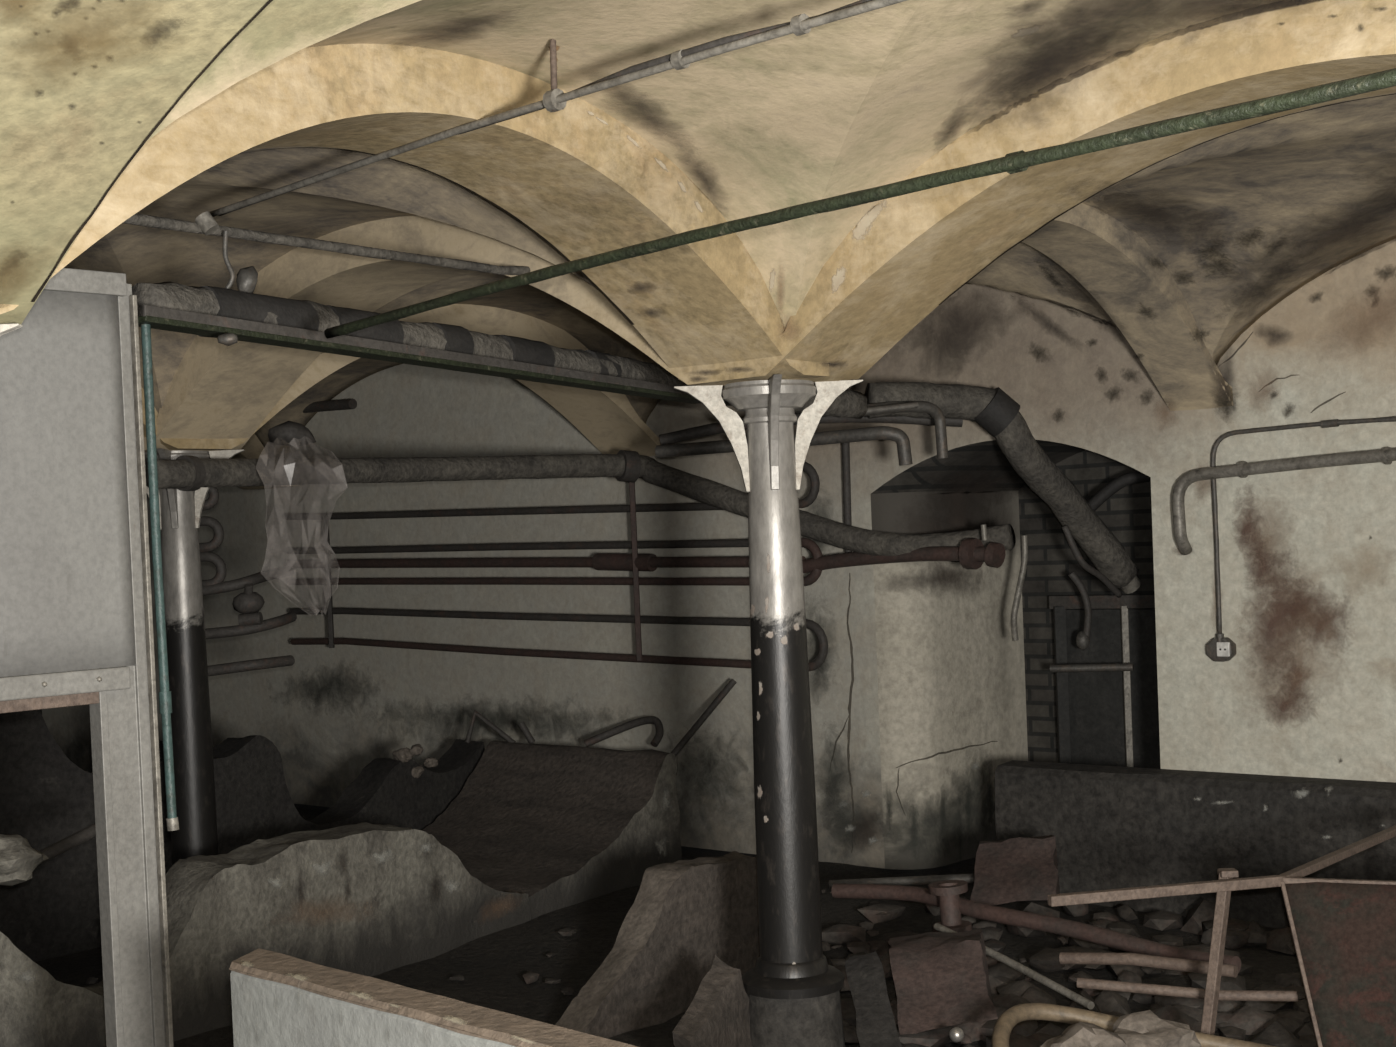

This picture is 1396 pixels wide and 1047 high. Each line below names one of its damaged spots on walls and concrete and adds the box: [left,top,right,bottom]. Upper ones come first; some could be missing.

leakage [1272,191,1396,266]
peeling [754,623,799,655]
leakage [431,707,579,736]
crack [830,573,855,853]
leakage [825,757,876,846]
crack [896,741,998,816]